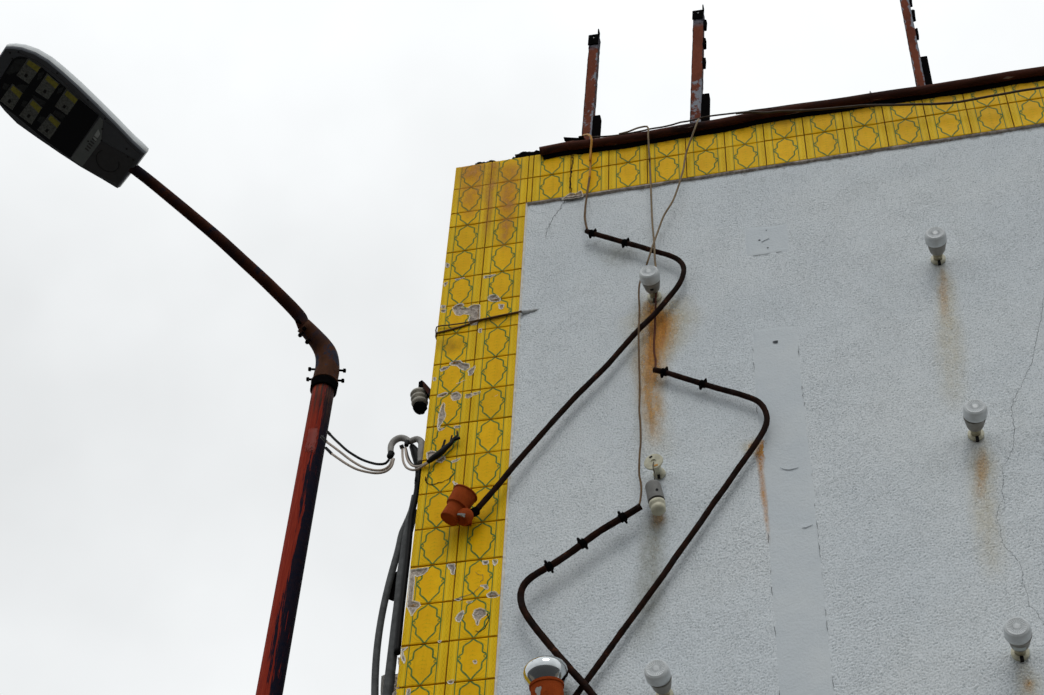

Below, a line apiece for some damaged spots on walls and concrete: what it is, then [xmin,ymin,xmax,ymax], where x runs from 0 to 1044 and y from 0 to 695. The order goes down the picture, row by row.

spalling [440,294,504,333]
spalling [433,360,476,381]
corrosion [641,302,676,417]
spalling [437,391,481,431]
spalling [406,567,429,616]
spalling [455,584,500,626]